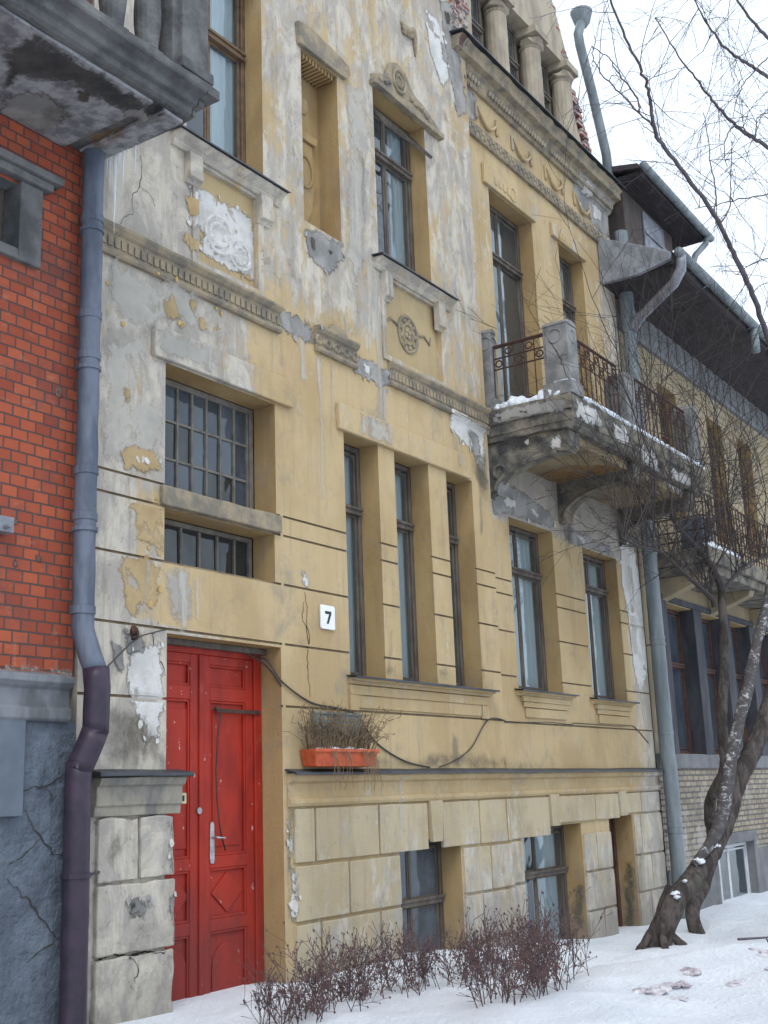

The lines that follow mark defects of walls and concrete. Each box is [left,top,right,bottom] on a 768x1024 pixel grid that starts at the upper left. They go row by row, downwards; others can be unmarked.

damp [2,35,163,116]
spalling [426,0,477,120]
peeling [106,258,223,332]
peeling [183,180,264,282]
spalling [304,229,346,274]
peeling [102,338,164,474]
peeling [449,399,691,495]
peeling [111,628,166,745]
peeling [119,499,164,618]
crack [302,592,310,691]
peeling [492,482,647,693]
crack [7,775,65,961]